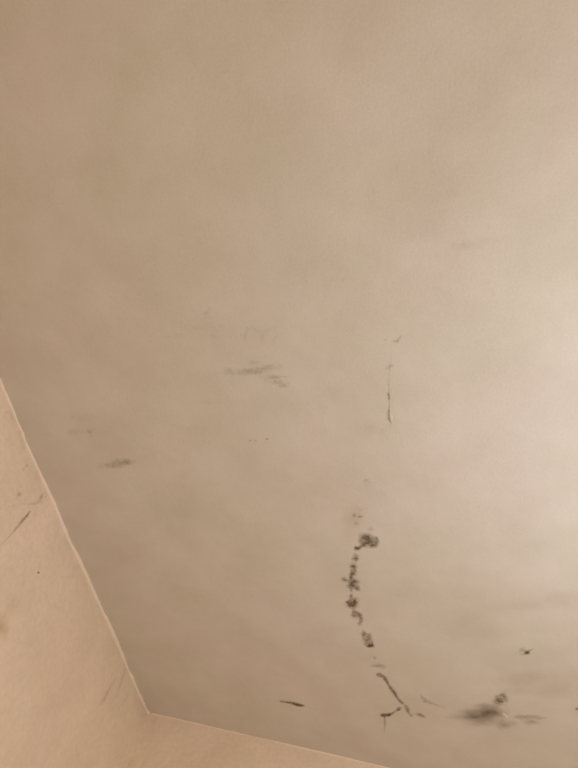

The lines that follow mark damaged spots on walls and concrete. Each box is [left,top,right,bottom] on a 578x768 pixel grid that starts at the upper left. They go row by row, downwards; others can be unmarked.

leakage [347,536,377,607]